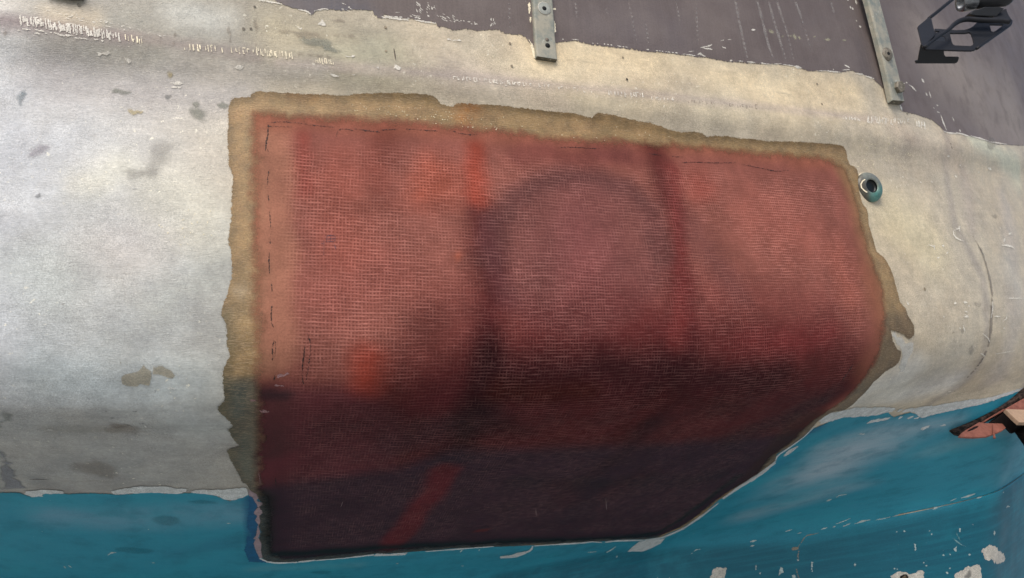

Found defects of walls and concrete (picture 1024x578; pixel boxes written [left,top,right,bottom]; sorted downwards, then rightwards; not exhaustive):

peeling [381,2,477,25]
peeling [184,44,293,70]
peeling [646,39,801,69]
peeling [905,78,1007,145]
damp [120,362,174,389]
peeling [426,388,1022,558]
peeling [111,486,408,564]
peeling [942,531,1005,578]